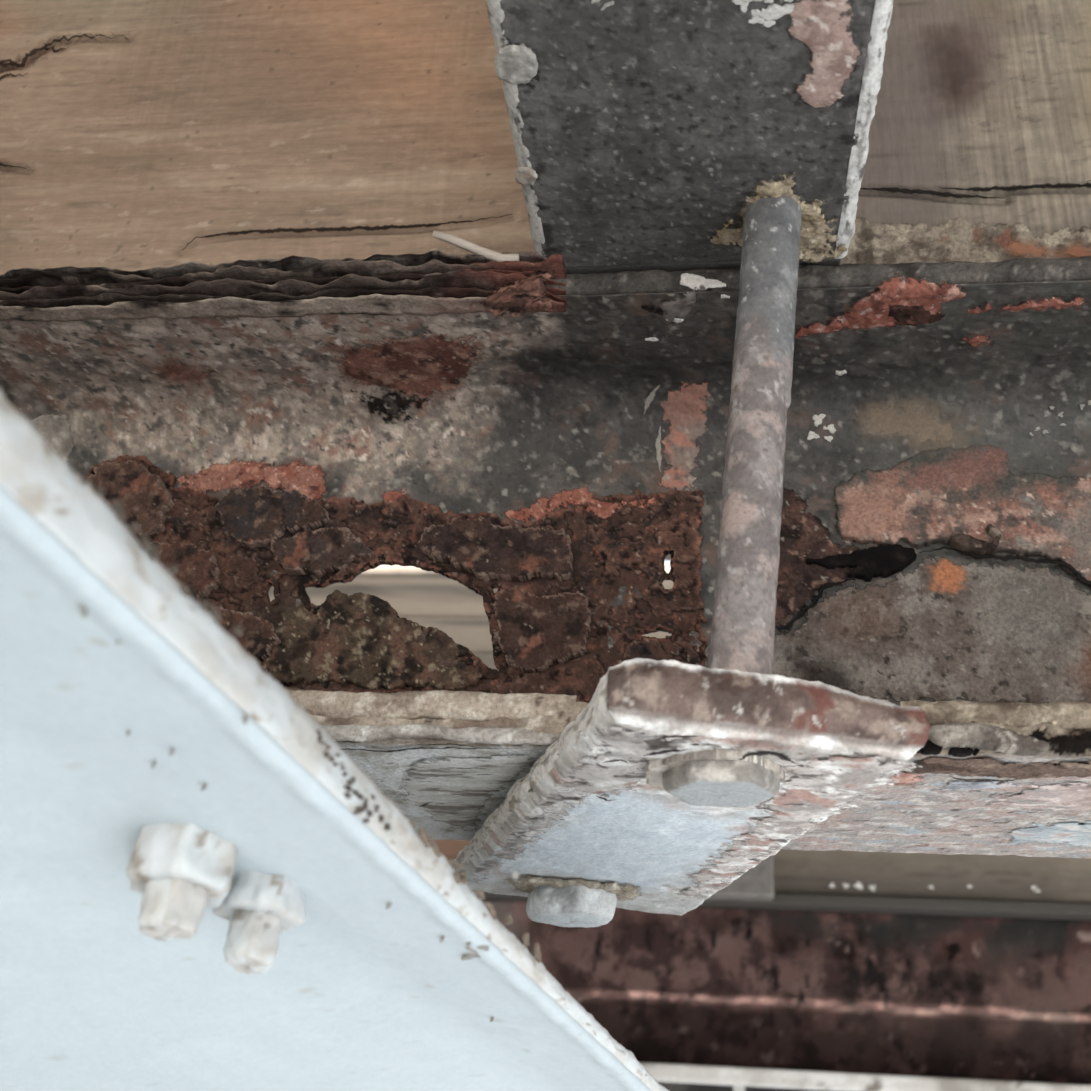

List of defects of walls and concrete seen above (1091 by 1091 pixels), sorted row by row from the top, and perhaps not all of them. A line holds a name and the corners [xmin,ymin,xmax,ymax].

crack [0,34,129,79]
peeling [732,0,862,108]
crack [860,180,1091,199]
corrosion [83,455,708,745]
crack [920,546,1091,586]
peeling [399,726,744,925]
peeling [678,752,924,901]
corrosion [535,913,1027,1022]